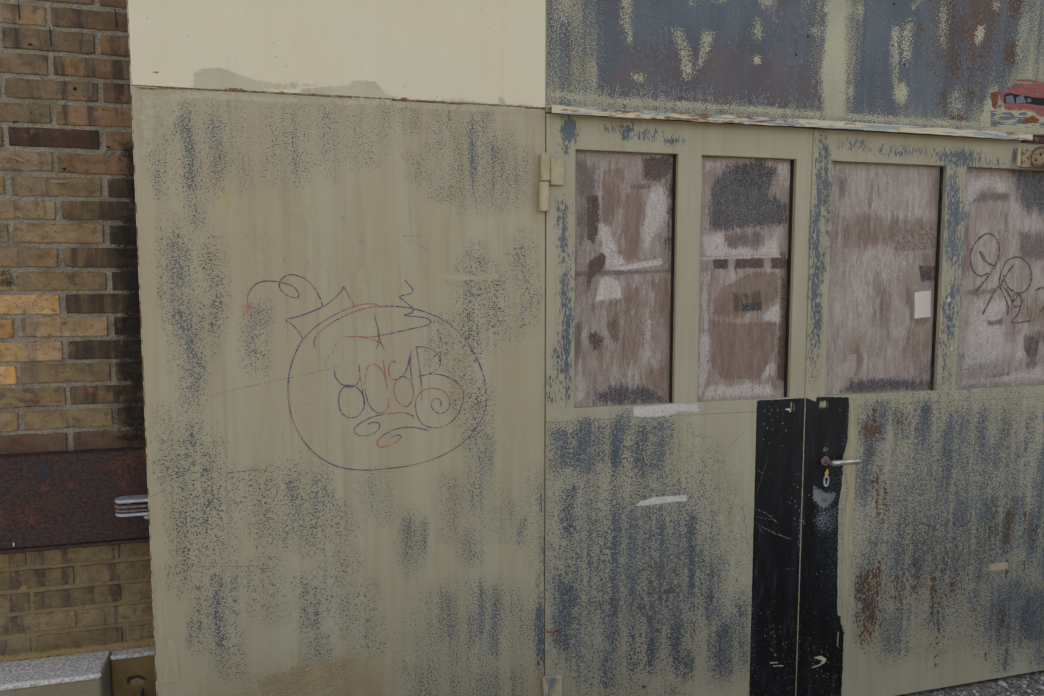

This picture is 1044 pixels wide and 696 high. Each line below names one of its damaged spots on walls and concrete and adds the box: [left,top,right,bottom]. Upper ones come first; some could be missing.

leakage [122,150,135,196]
leakage [118,312,141,382]
peeling [145,89,756,696]
peeling [547,0,1044,676]
corrosion [858,400,911,530]
corrosion [852,497,1039,668]